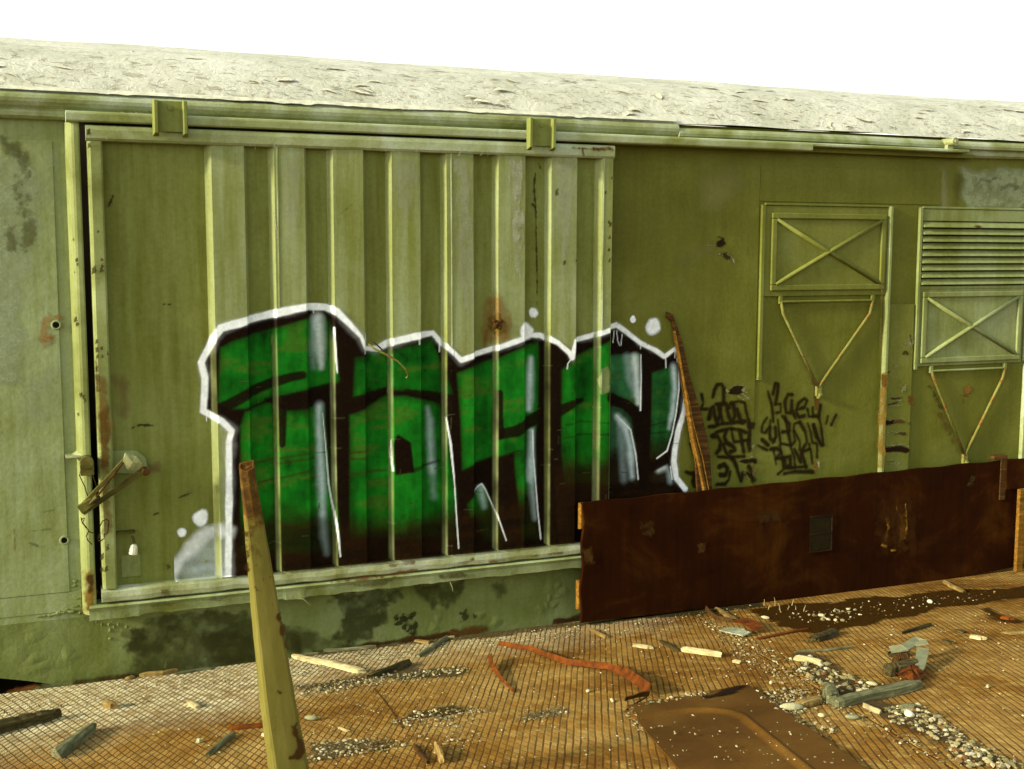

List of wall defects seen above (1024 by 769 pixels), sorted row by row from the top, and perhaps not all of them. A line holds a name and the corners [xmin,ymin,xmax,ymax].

corrosion [484,299,508,342]
corrosion [95,361,112,472]
corrosion [877,372,887,468]
water stain [129,611,256,676]
water stain [285,632,316,651]
water stain [333,590,418,648]
water stain [417,580,463,607]